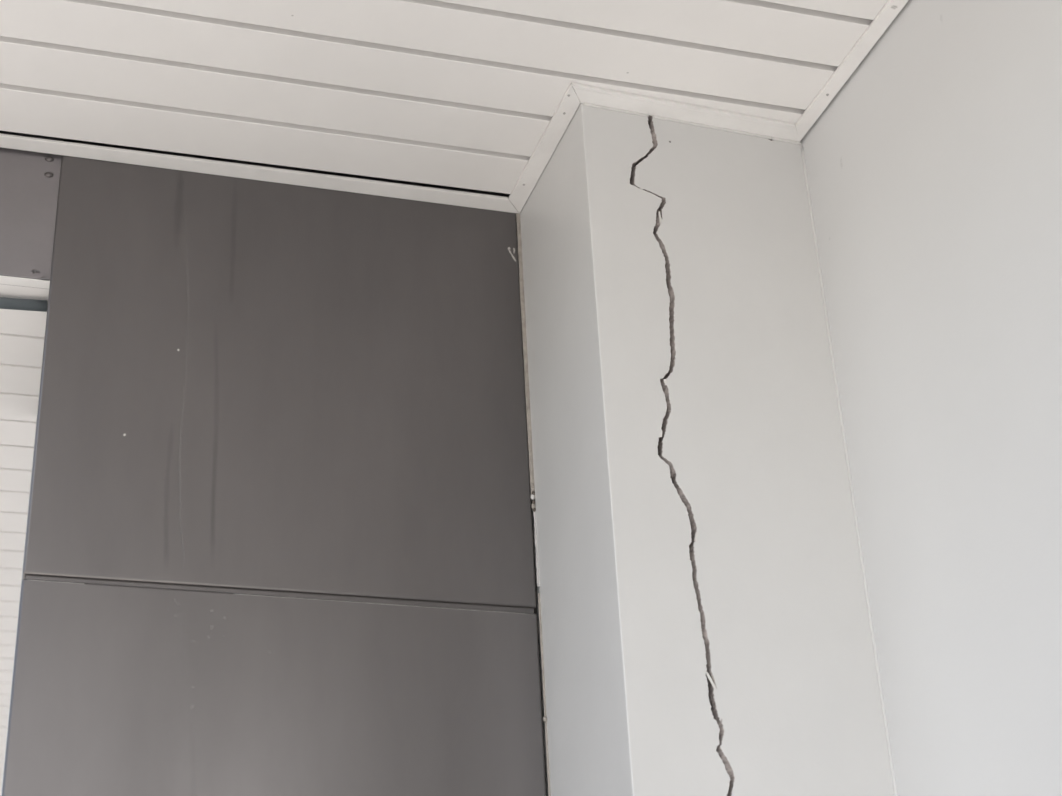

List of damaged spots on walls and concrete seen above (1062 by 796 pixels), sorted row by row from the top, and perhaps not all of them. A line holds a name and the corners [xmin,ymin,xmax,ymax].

crack [630,115,735,796]